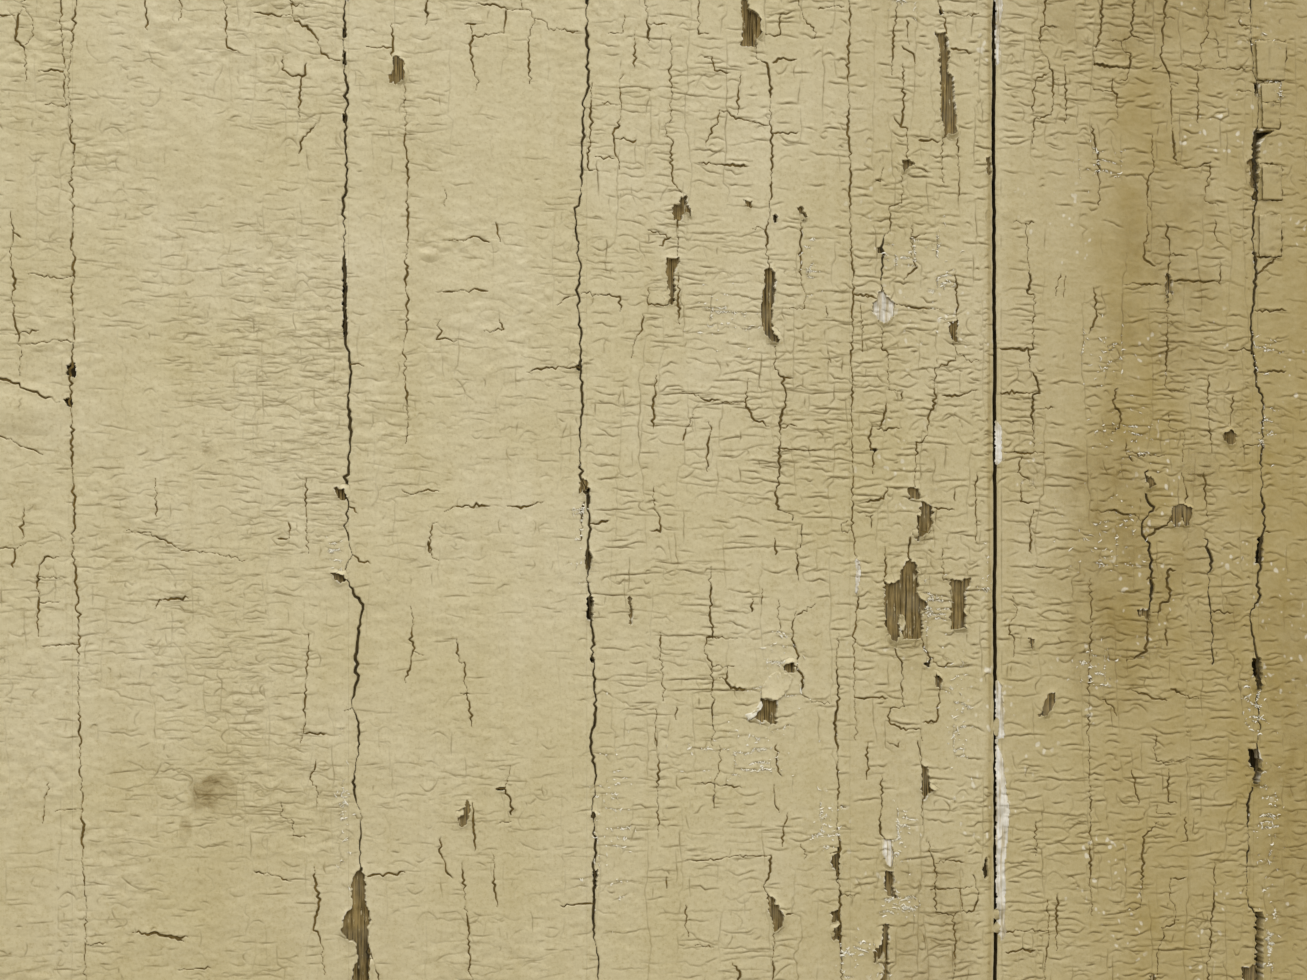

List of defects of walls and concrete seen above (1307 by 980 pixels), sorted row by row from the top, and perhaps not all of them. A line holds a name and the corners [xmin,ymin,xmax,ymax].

peeling [740,0,766,47]
peeling [935,33,961,140]
crack [402,88,504,443]
peeling [684,268,784,346]
crack [0,0,209,975]
crack [223,0,404,877]
crack [465,0,1098,980]
crack [1031,0,1288,980]
peeling [687,630,811,781]
peeling [883,543,992,769]
peeling [341,869,376,980]
crack [438,770,514,979]